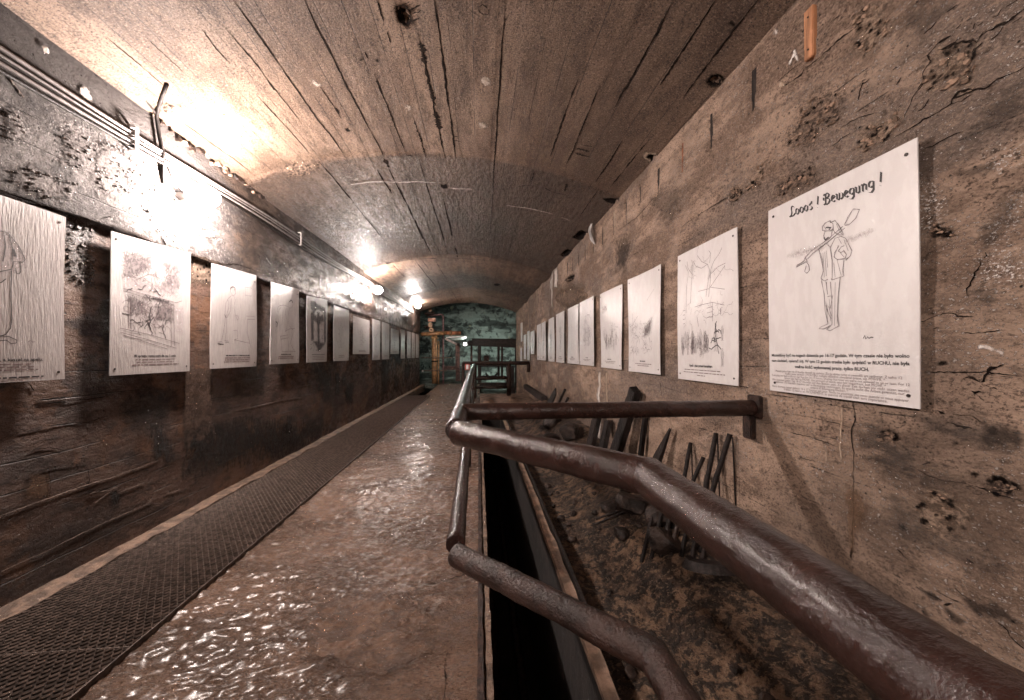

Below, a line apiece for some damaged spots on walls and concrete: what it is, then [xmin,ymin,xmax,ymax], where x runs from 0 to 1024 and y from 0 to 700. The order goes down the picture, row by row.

spalling [851,5,890,59]
spalling [922,32,980,92]
crack [893,0,1024,148]
spalling [772,85,845,201]
crack [932,364,1014,429]
crack [787,403,856,491]